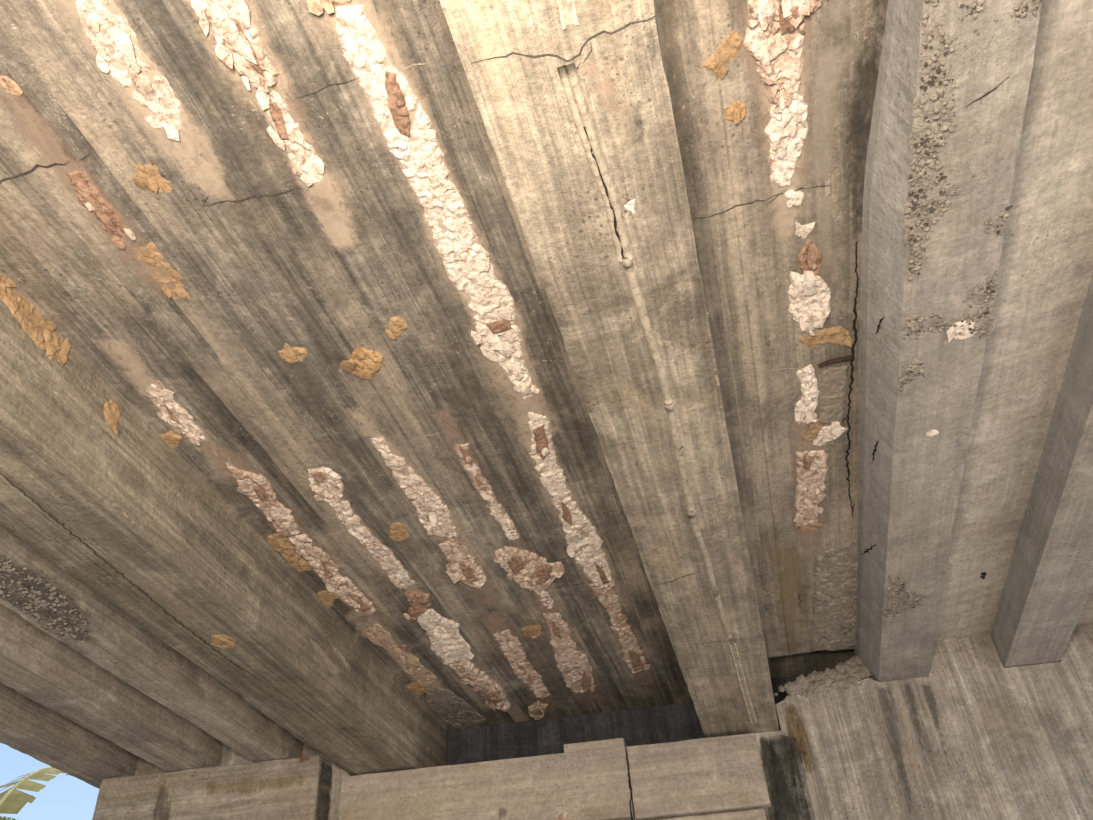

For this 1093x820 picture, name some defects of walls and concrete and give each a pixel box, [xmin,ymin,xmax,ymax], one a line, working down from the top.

crack [0,154,90,183]
spalling [54,0,233,199]
spalling [183,0,354,249]
spalling [305,0,656,720]
crack [472,15,656,70]
crack [694,185,830,219]
spalling [702,0,858,650]
crack [842,242,884,517]
damp [0,560,88,638]
spalling [99,339,511,729]